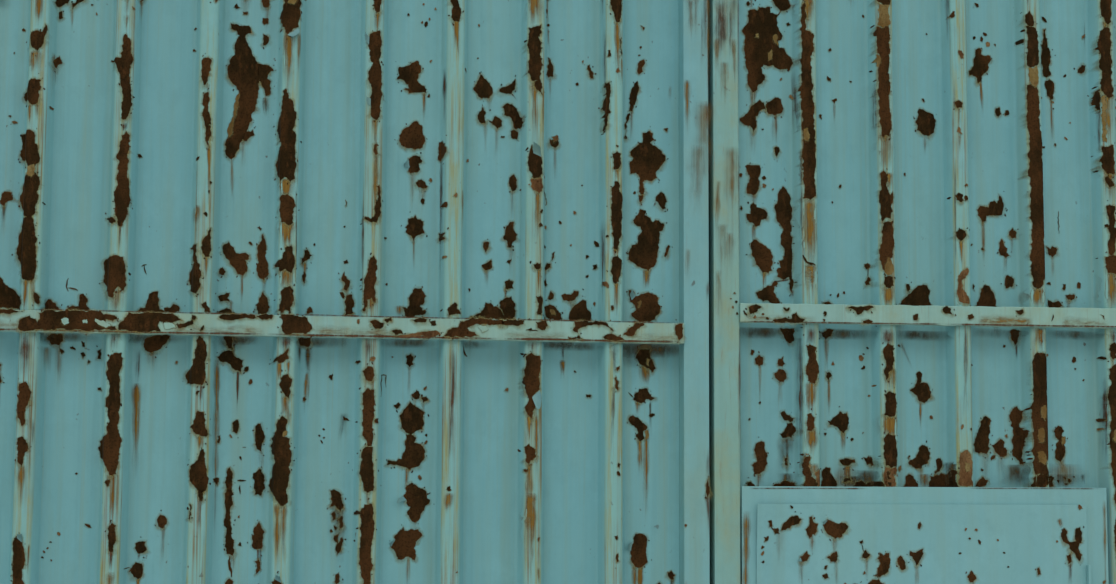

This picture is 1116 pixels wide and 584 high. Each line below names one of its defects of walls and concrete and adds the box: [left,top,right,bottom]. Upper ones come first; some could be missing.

rust [705,0,1116,552]
rust [744,518,764,584]
rust [778,505,848,563]
rust [1056,520,1084,561]